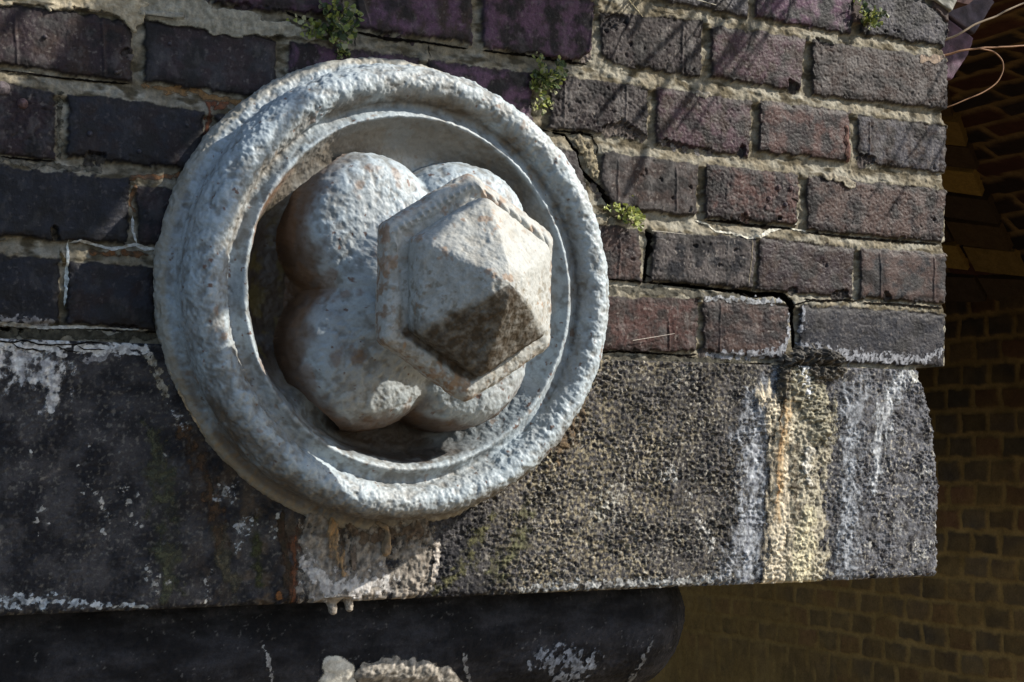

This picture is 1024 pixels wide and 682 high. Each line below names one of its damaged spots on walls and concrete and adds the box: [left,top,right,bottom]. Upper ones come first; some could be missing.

crack [608,231,810,348]
damp [0,313,182,414]
damp [518,284,944,593]